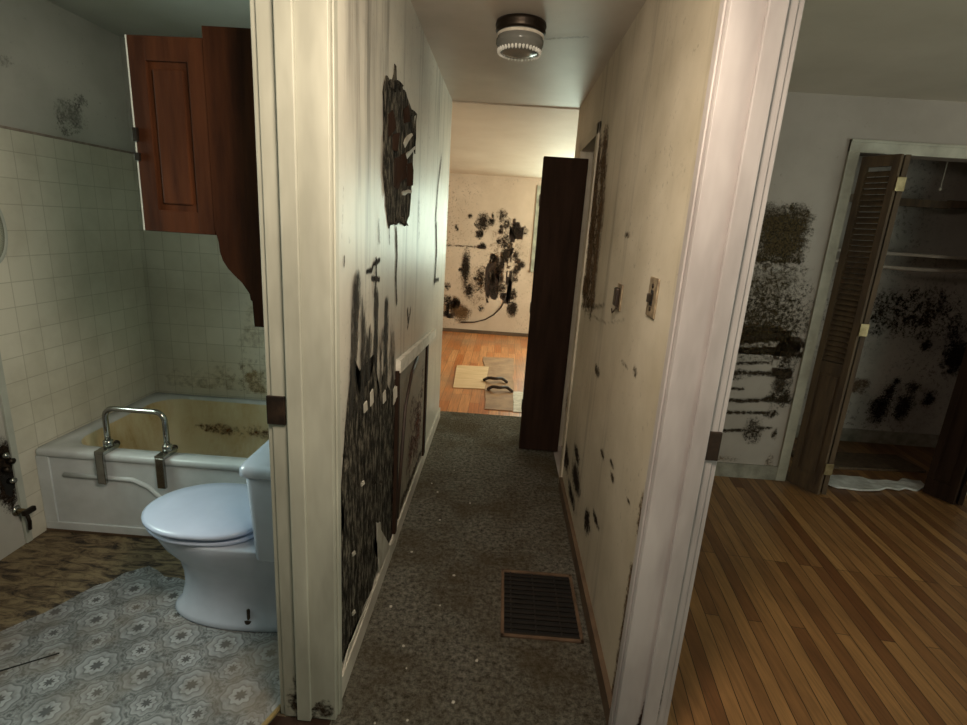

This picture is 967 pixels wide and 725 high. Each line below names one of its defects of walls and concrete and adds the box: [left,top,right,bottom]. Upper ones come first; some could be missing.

water stain [443,209,527,321]
water stain [723,203,815,444]
water stain [870,289,967,376]
water stain [400,370,423,508]
water stain [852,378,937,424]